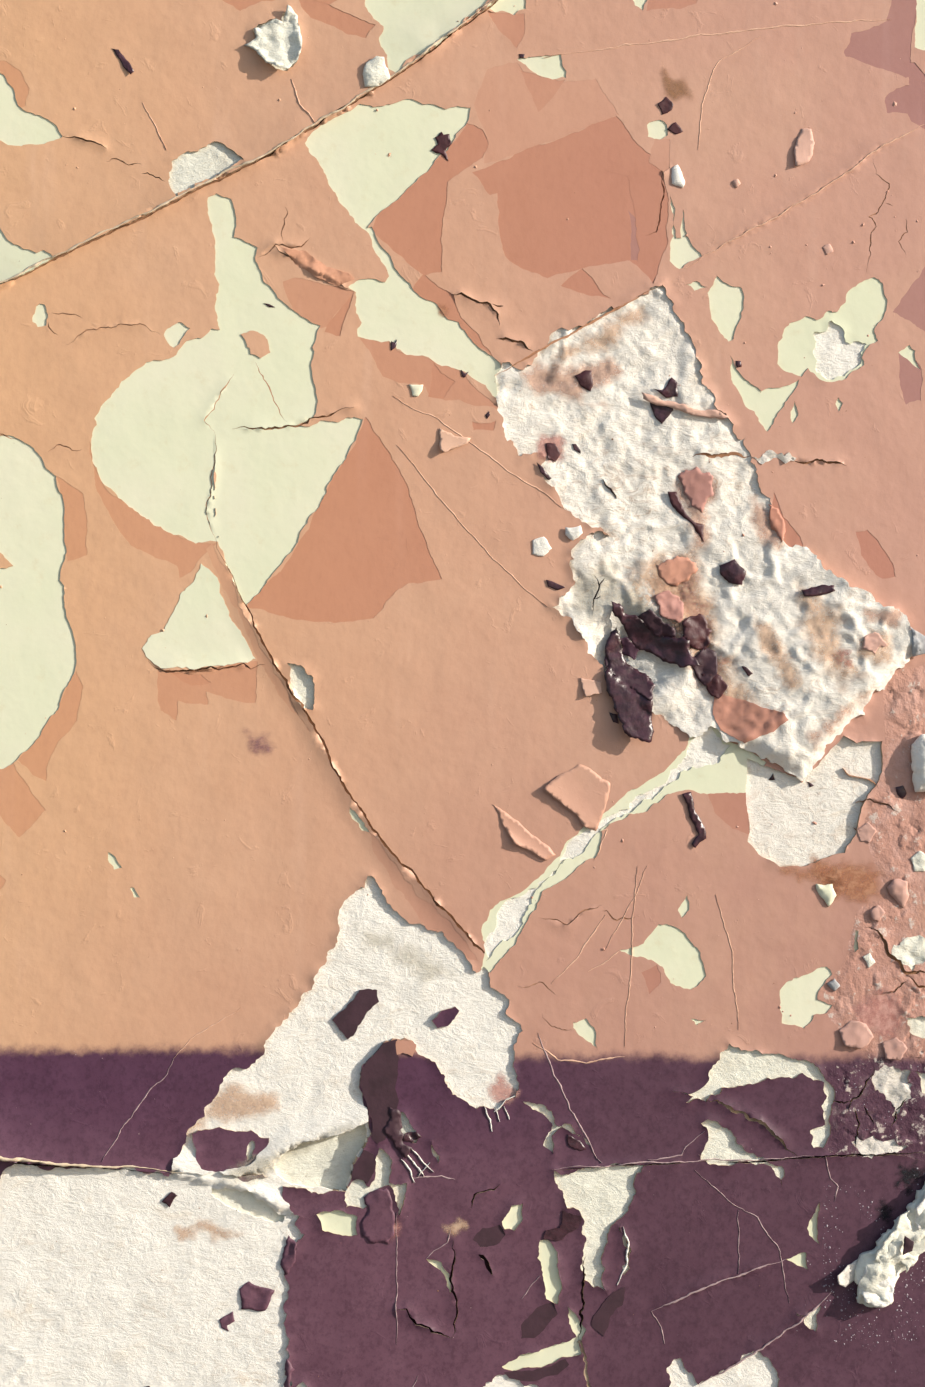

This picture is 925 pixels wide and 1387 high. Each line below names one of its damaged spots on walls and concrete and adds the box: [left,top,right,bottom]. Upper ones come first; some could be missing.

peeling [0,61,62,146]
crack [0,0,498,287]
crack [48,313,150,343]
peeling [0,142,363,837]
crack [154,364,485,961]
flaking render [0,286,925,1387]
crack [0,1156,182,1173]
crack [577,1258,591,1387]